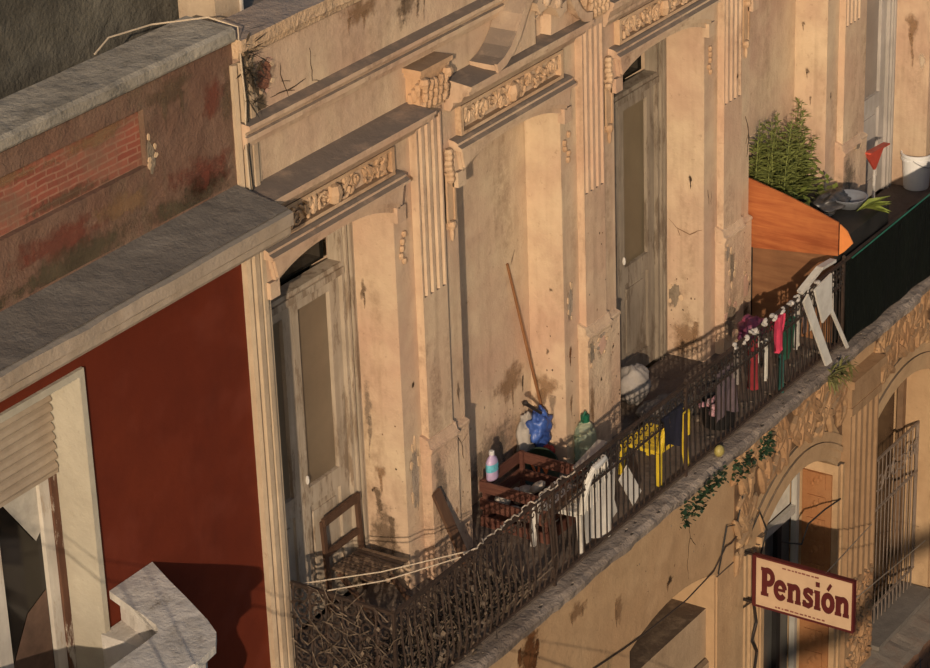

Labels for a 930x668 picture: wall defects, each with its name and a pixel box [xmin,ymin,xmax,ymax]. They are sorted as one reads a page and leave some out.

crack [270,48,320,98]
leakage [206,76,232,117]
leakage [675,322,698,352]
leakage [501,363,521,401]
leakage [372,469,396,554]
corrosion [518,630,539,668]